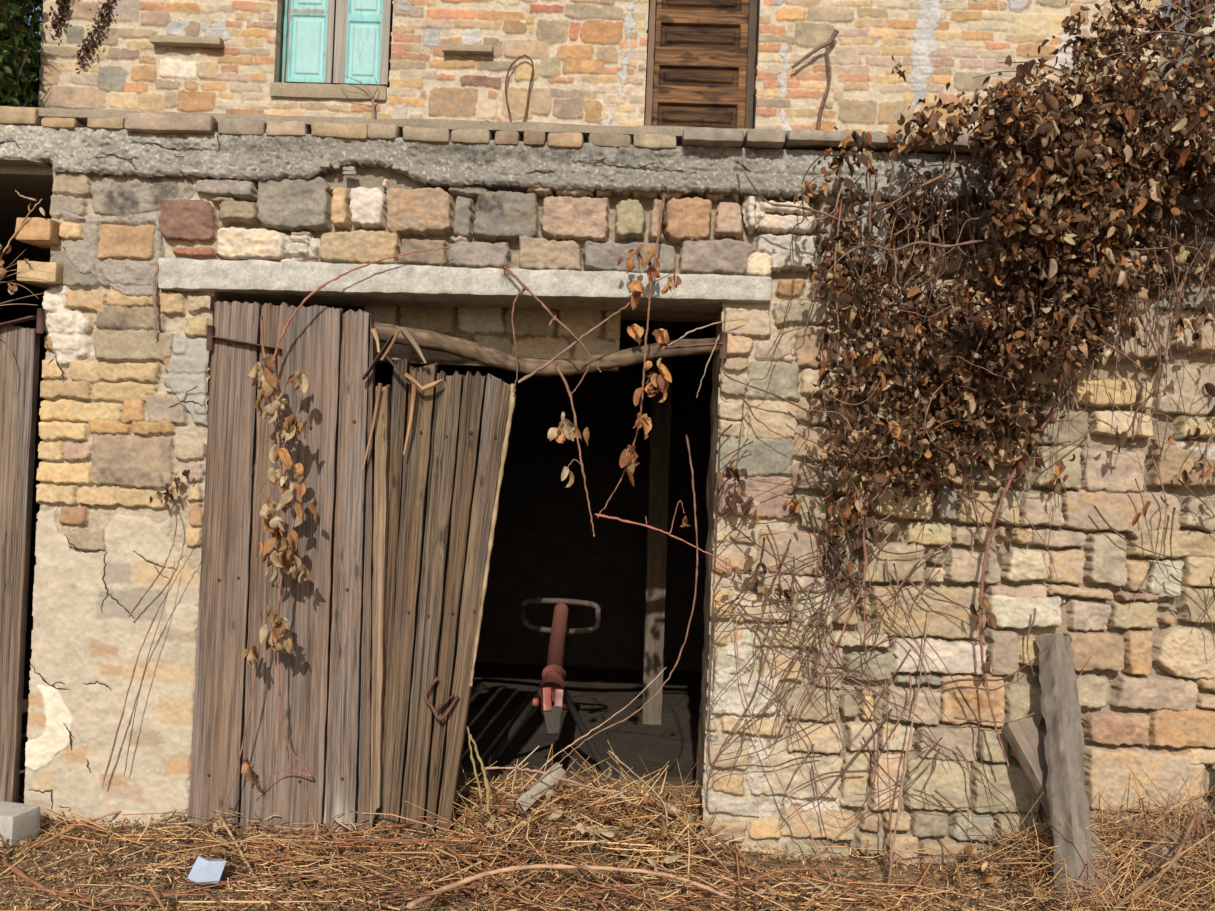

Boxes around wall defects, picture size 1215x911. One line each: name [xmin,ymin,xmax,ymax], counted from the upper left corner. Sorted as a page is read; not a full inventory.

crack [64,534,176,619]